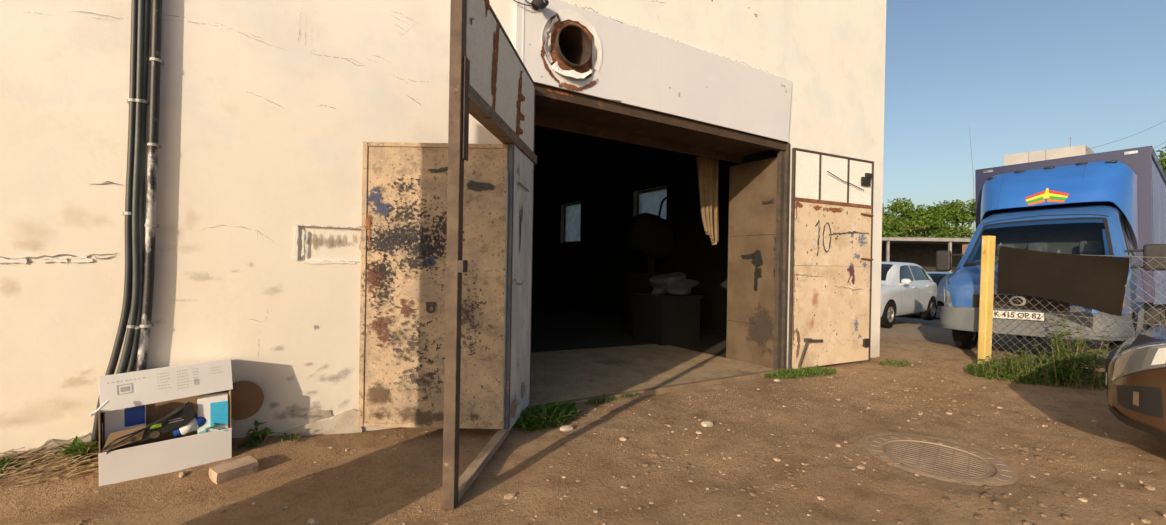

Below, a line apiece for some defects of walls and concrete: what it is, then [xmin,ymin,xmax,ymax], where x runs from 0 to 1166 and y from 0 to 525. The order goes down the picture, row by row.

rust [470,0,500,111]
rust [541,40,598,97]
rust [516,71,525,136]